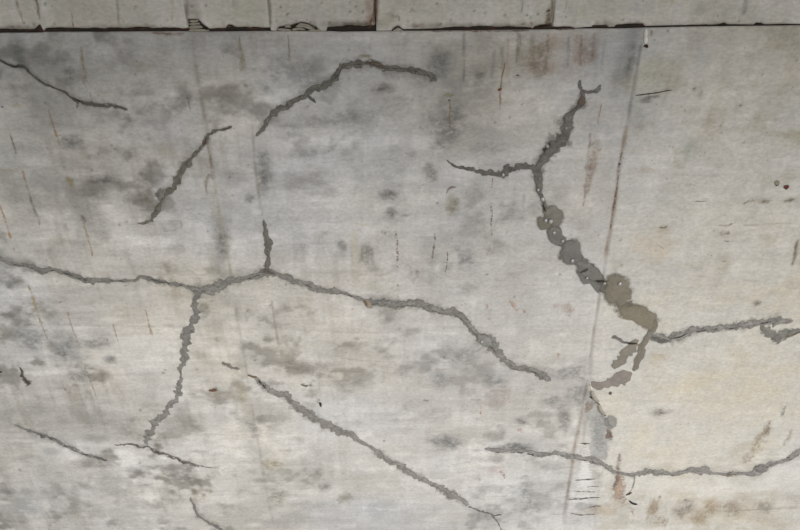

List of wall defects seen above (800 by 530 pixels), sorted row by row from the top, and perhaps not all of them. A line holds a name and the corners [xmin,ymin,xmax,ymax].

crack [0,60,127,110]
crack [256,55,437,136]
crack [138,126,232,225]
crack [447,80,800,395]
crack [0,220,551,468]
crack [222,362,502,530]
crack [485,445,800,505]